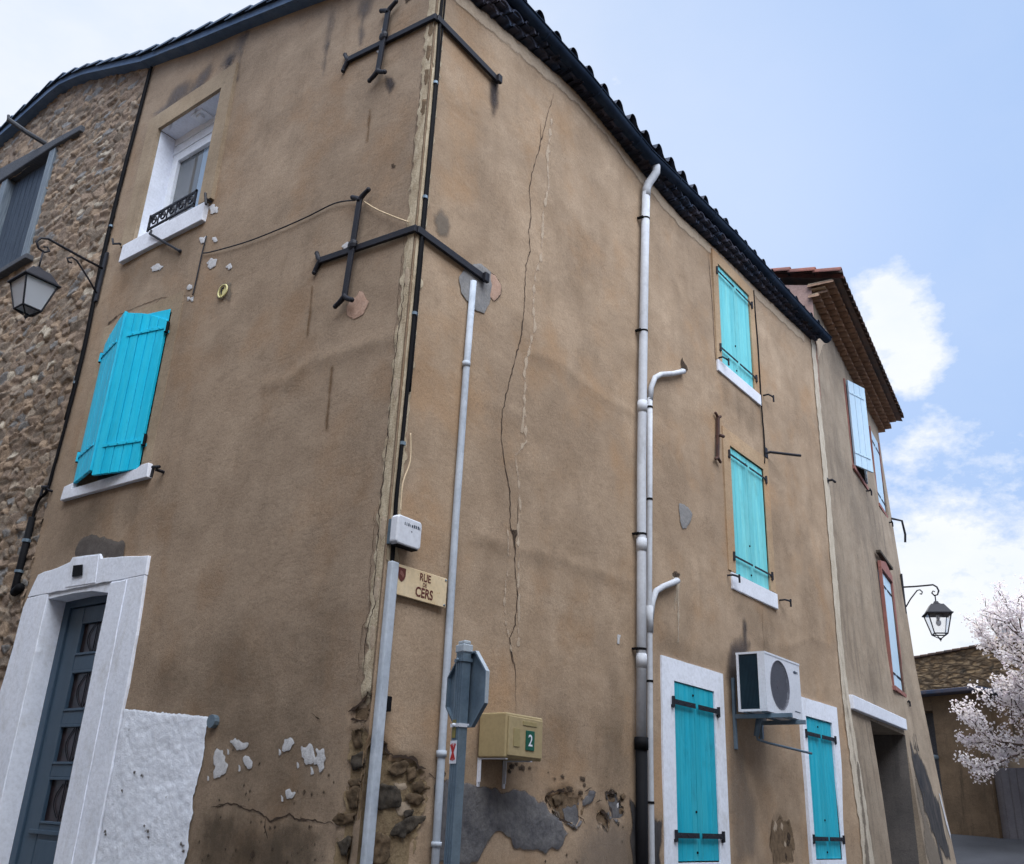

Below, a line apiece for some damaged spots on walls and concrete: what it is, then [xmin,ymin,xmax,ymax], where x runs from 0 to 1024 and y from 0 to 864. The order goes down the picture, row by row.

crack [492,94,554,699]
peeling [332,0,446,864]
peeling [207,738,260,781]
peeling [279,737,334,804]
crack [212,802,332,838]
flaking render [545,772,626,832]
flaking render [770,816,795,864]